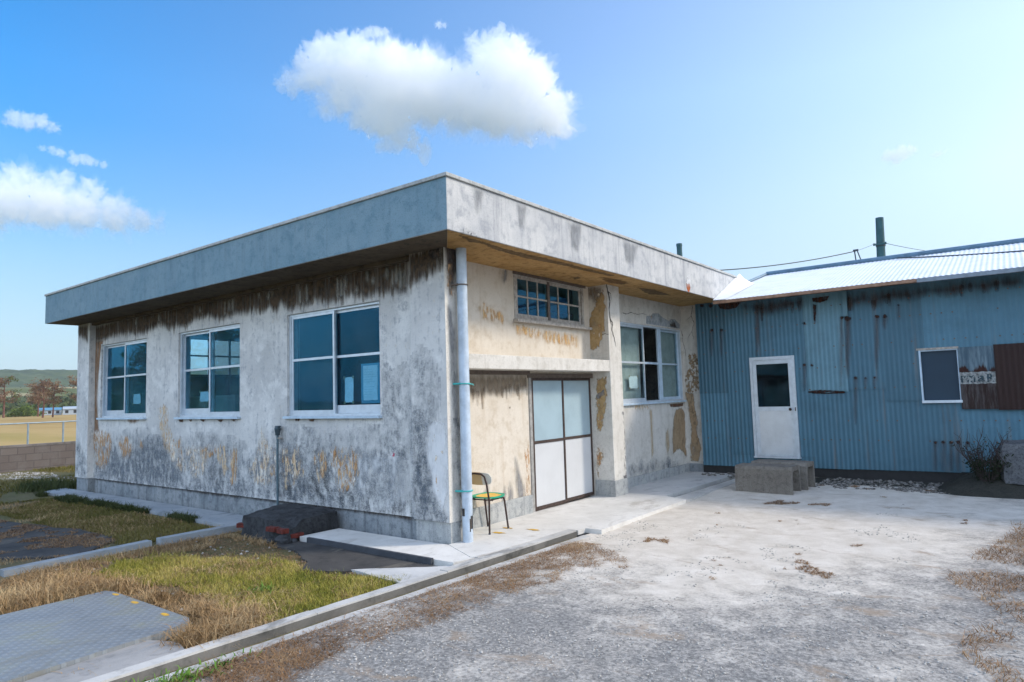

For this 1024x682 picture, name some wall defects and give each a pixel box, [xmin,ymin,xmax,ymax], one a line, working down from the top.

water stain [78,247,458,425]
flaking render [588,287,606,350]
crack [602,284,645,345]
corrosion [755,296,829,325]
corrosion [840,286,963,337]
flaking render [595,377,607,431]
flaking render [670,354,701,461]
peeling [93,431,143,468]
peeling [159,406,237,484]
water stain [75,412,434,520]
peeling [251,428,358,491]